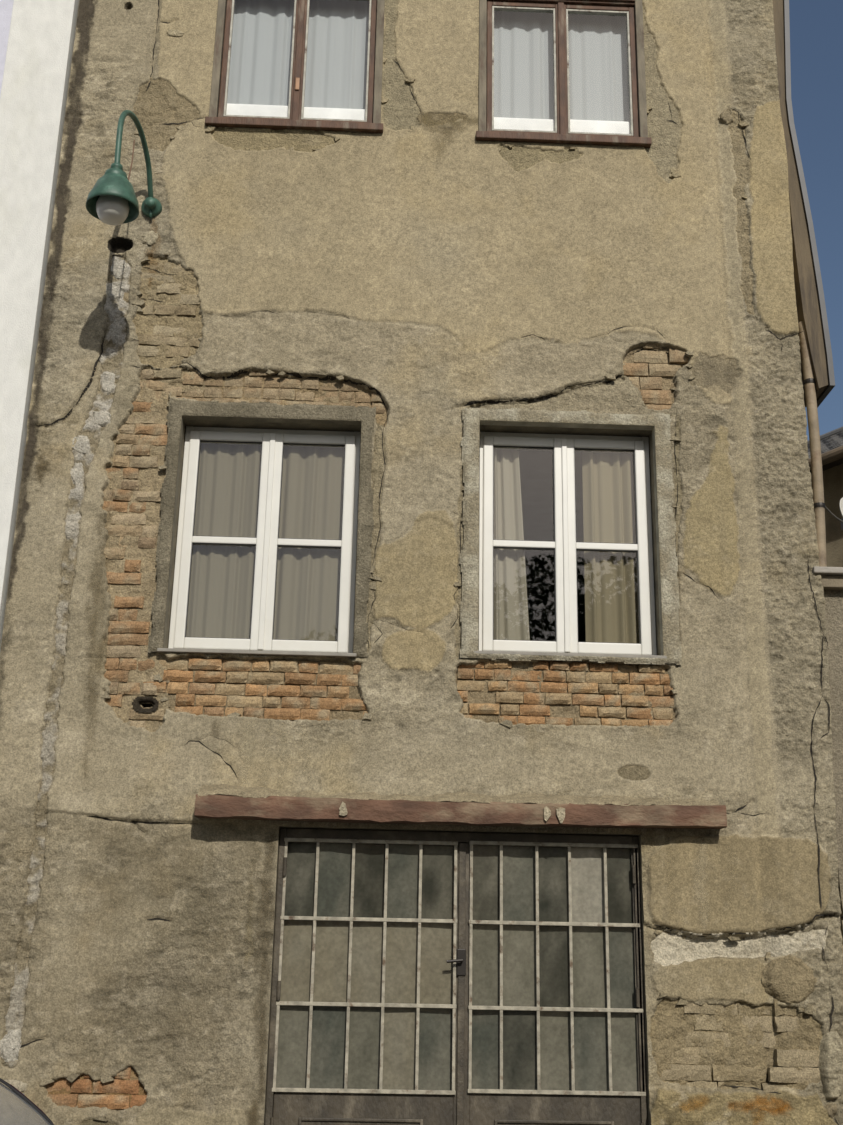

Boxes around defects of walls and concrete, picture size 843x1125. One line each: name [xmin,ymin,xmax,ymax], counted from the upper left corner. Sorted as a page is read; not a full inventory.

spalling [133,77,340,152]
spalling [727,109,755,315]
leakage [7,0,95,599]
crack [36,336,143,426]
flaking render [101,253,388,732]
spalling [468,343,742,552]
flaking render [453,468,679,728]
crack [184,735,238,780]
spalling [651,923,828,966]
spalling [650,993,822,1092]
flaking render [39,1067,147,1125]